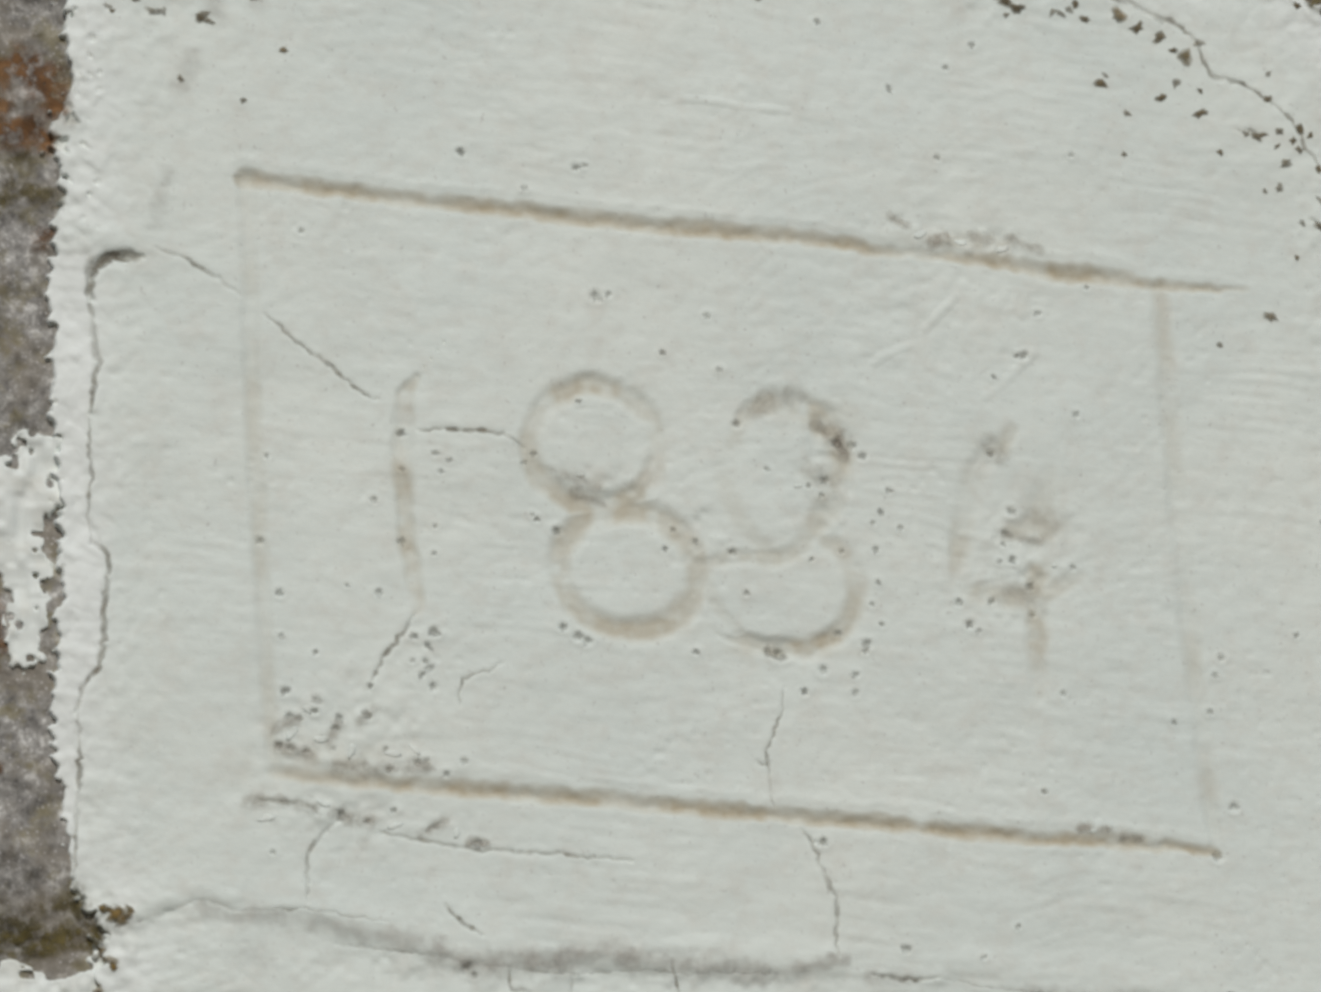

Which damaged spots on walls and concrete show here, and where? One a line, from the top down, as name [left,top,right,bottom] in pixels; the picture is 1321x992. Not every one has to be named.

crack [88,252,133,291]